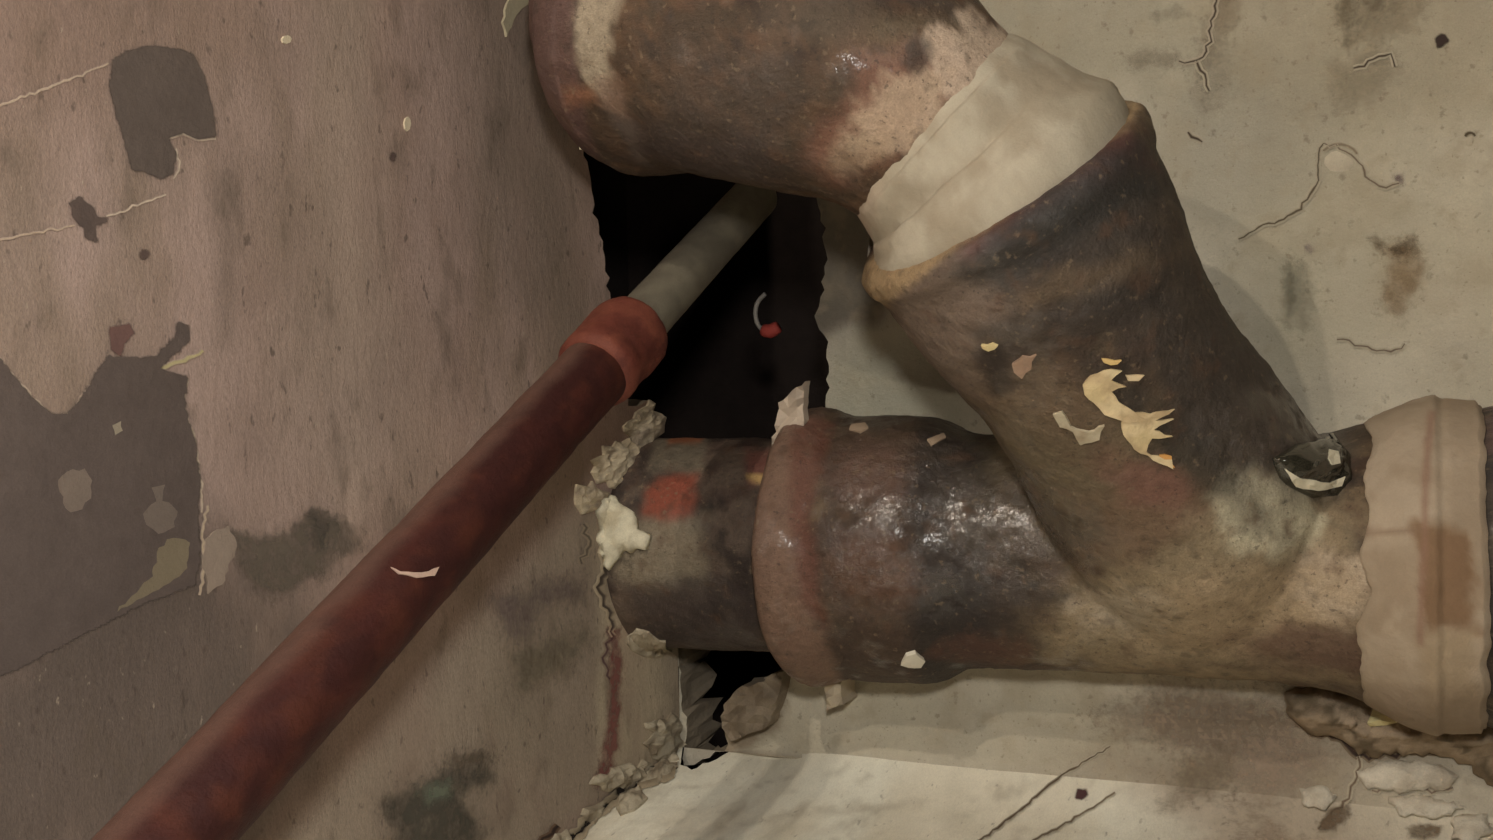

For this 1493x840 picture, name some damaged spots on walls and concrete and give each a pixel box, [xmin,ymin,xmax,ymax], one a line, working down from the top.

crack [1178,0,1220,92]
peeling [0,45,216,242]
crack [1186,130,1203,144]
crack [1238,141,1401,241]
peeling [0,322,237,676]
crack [978,745,1116,840]
flaking render [1299,785,1350,830]
flaking render [1356,760,1493,840]